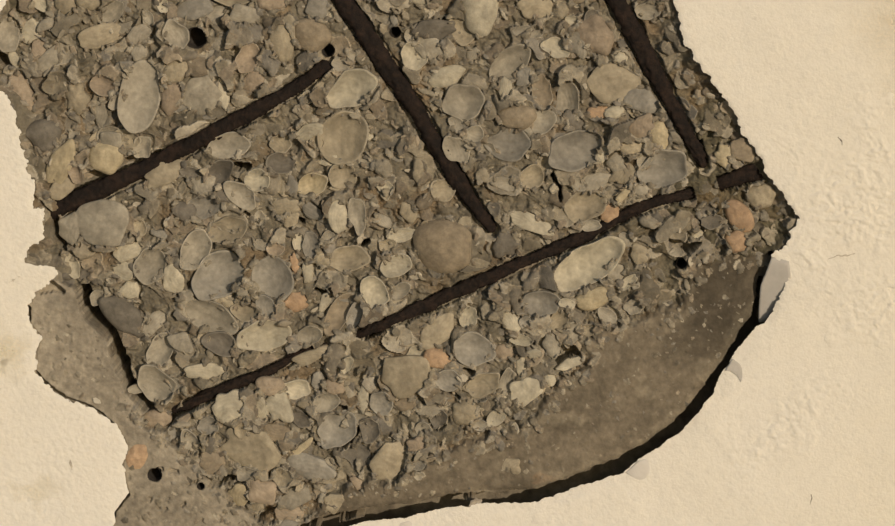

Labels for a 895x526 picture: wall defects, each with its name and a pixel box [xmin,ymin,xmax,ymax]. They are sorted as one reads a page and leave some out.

spalling [180,146,220,175]
flaking render [759,257,791,322]
spalling [473,410,507,431]
spalling [125,444,148,469]
spalling [168,425,200,454]
spalling [199,436,225,474]
spalling [406,436,425,452]
spalling [147,467,162,482]
spalling [273,467,292,486]
spalling [228,482,248,507]
spalling [323,492,344,514]
spalling [274,507,306,526]